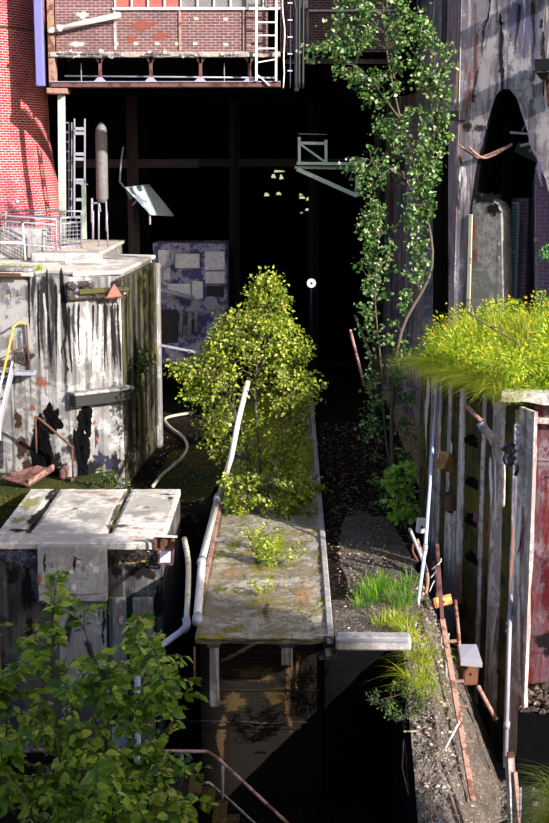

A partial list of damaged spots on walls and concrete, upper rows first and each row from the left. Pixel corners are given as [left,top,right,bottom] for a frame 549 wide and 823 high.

rust [466,4,478,111]
crack [474,0,505,90]
damp [28,267,150,413]